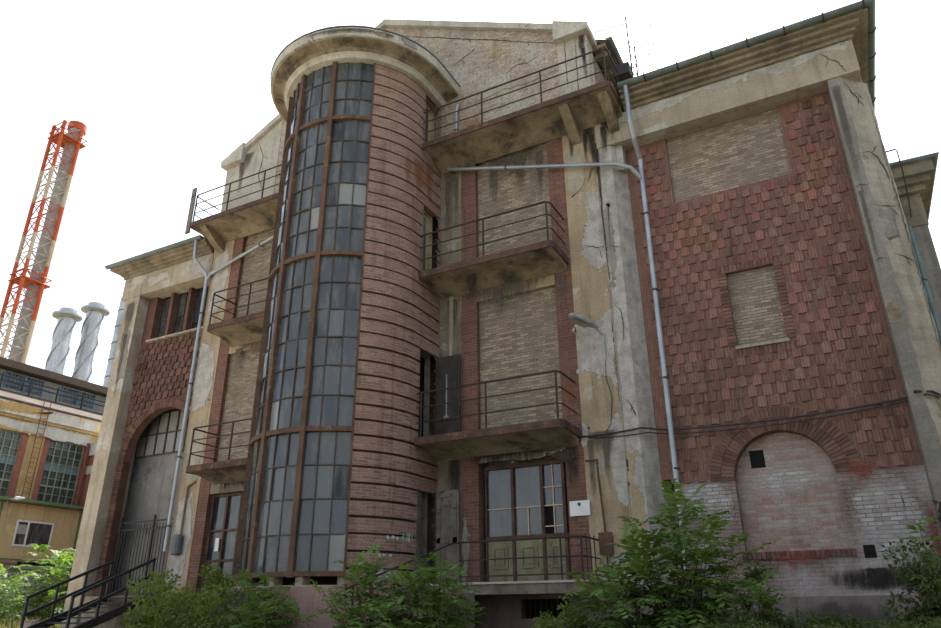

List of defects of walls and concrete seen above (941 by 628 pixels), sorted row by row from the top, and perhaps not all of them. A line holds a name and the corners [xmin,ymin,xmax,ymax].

crack [820,53,941,350]
peeling [572,309,618,387]
peeling [0,400,91,446]
peeling [581,423,591,448]